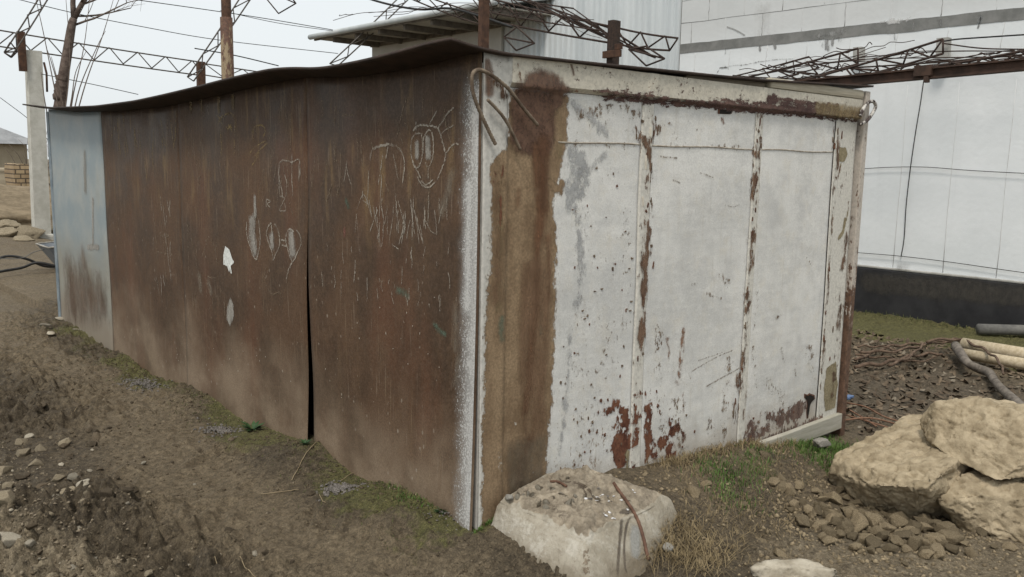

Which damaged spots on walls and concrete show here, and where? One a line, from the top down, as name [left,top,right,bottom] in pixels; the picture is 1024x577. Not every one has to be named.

rust [485,59,862,494]